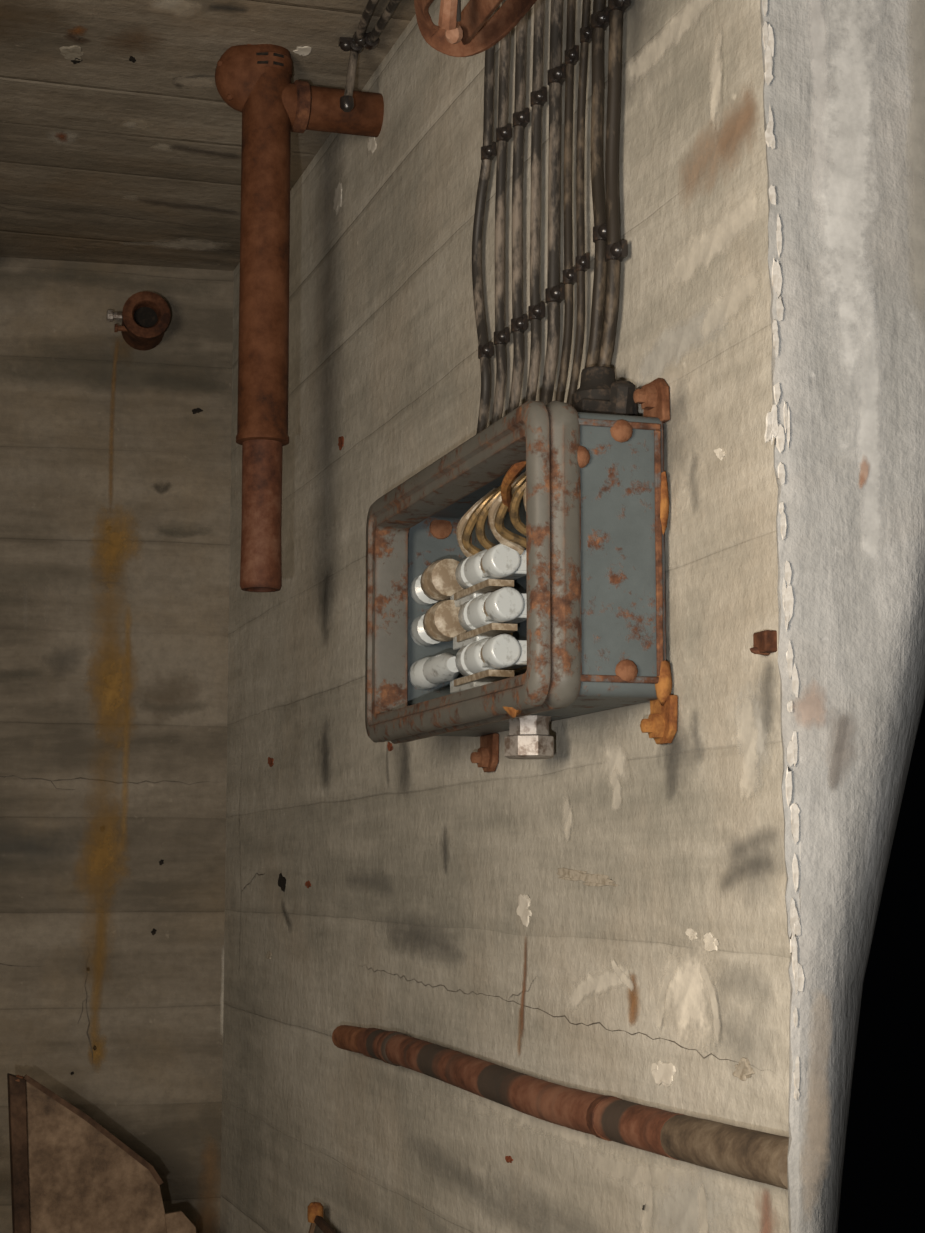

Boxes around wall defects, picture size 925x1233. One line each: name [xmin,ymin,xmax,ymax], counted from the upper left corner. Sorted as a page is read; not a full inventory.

corrosion [518,942,526,1051]